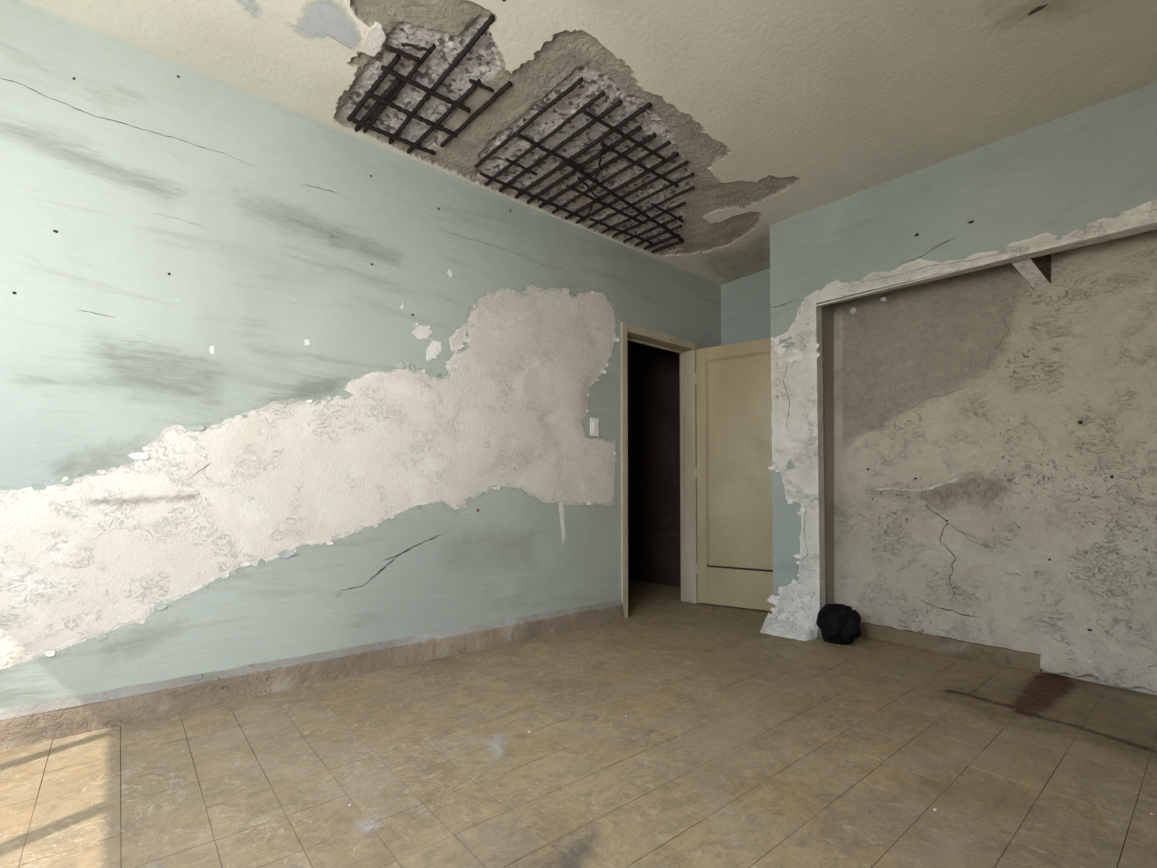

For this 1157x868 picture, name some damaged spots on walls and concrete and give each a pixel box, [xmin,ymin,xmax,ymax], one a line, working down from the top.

crack [0,78,256,167]
spalling [297,0,802,257]
peeling [0,284,620,670]
crack [336,533,443,598]
crack [921,492,986,617]
peeling [760,200,1157,641]